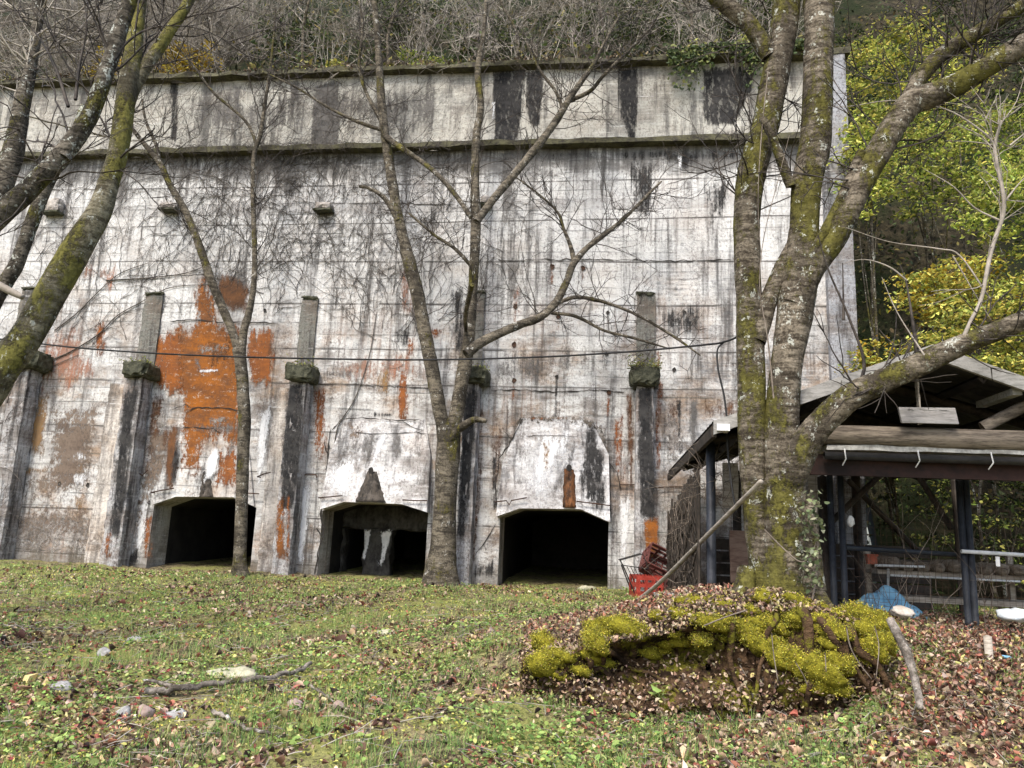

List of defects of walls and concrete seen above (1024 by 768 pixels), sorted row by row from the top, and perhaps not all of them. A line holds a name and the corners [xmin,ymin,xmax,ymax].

water stain [492,69,543,140]
water stain [618,67,638,138]
water stain [703,66,754,134]
rust [41,322,105,389]
rust [147,274,275,490]
rust [342,339,414,419]
water stain [519,427,606,509]
rust [644,517,660,558]